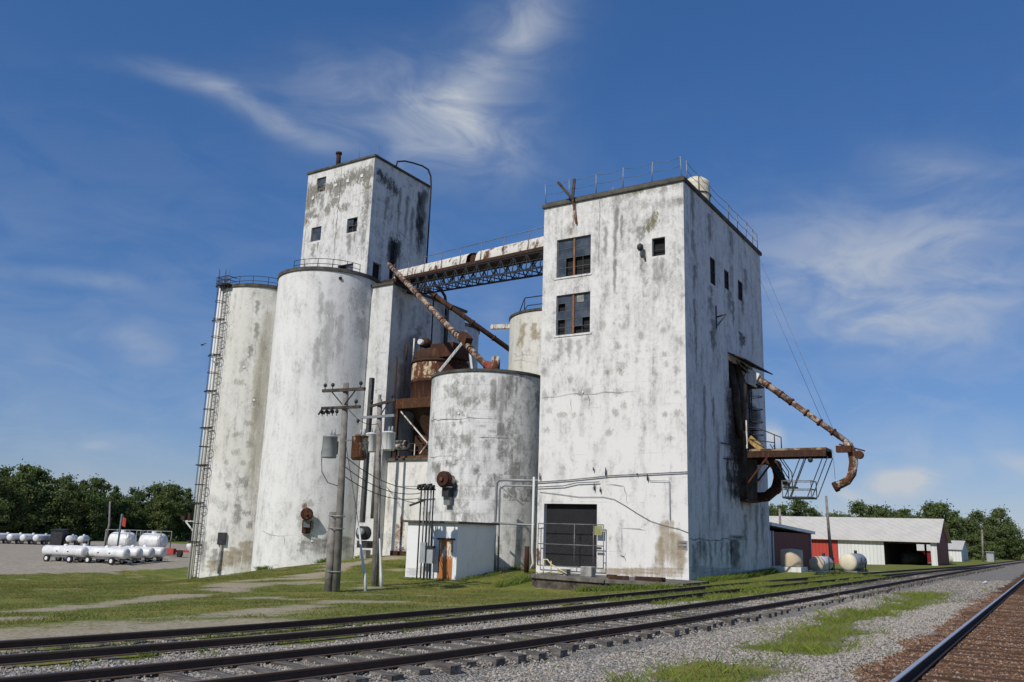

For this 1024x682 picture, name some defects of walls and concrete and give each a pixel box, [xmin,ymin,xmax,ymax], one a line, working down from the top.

damp [416,192,427,243]
damp [388,238,401,266]
damp [726,374,760,505]
damp [605,521,684,576]